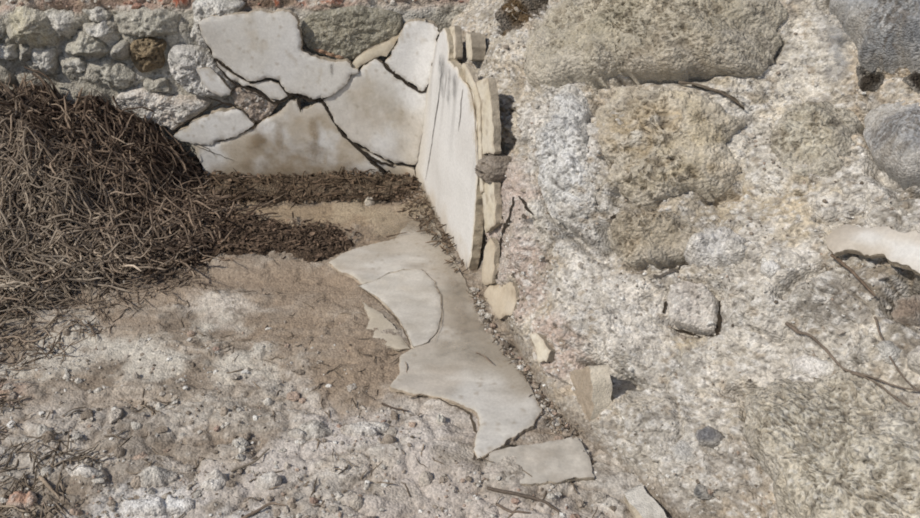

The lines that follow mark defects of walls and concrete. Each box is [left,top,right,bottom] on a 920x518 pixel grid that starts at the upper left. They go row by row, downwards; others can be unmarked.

crack [172,25,394,176]
crack [382,61,477,180]